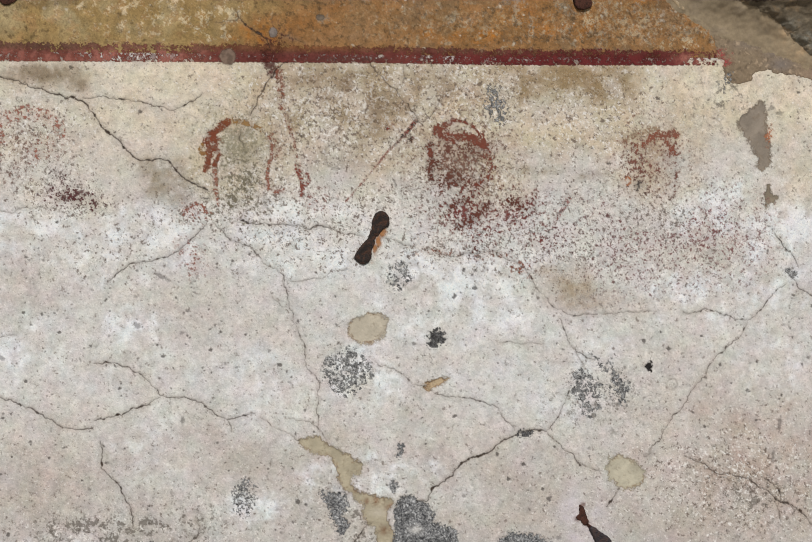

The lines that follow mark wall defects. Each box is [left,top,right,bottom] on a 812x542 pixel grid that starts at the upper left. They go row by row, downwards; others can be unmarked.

crack [0,76,207,199]
crack [416,417,558,503]